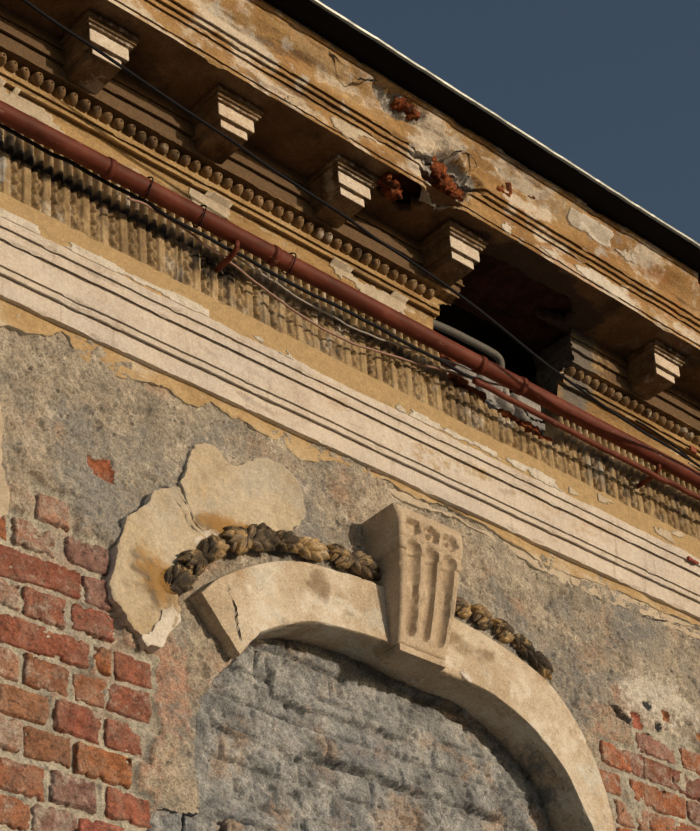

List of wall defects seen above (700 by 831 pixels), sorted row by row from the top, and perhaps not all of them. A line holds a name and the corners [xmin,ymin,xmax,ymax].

peeling [0,77,65,134]
peeling [0,208,40,235]
peeling [188,188,233,220]
spalling [377,172,403,203]
spalling [426,156,464,202]
peeling [66,241,209,318]
peeling [329,257,409,315]
peeling [0,299,350,467]
peeling [363,469,700,640]
spalling [0,405,306,831]
crack [223,575,243,641]
spalling [594,709,700,831]